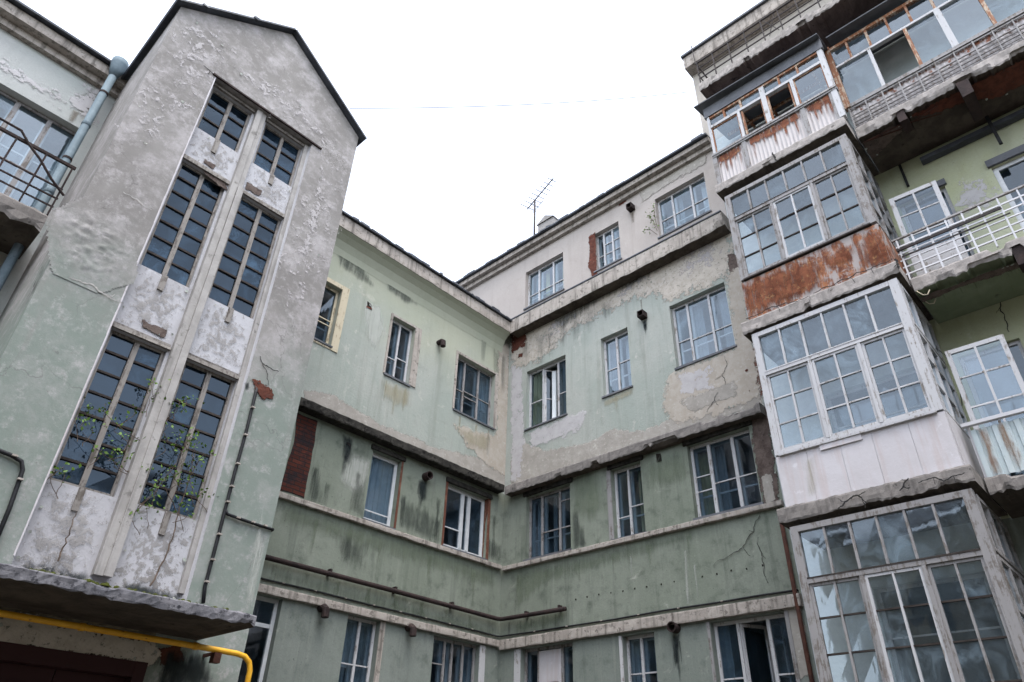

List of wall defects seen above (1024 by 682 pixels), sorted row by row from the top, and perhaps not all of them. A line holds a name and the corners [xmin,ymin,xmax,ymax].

peeling [0,57,100,127]
rust [718,95,834,171]
rust [742,230,893,315]
flaking render [252,379,274,400]
peeling [304,232,780,509]
crack [838,492,867,509]
crack [899,473,964,491]
crack [715,515,767,580]